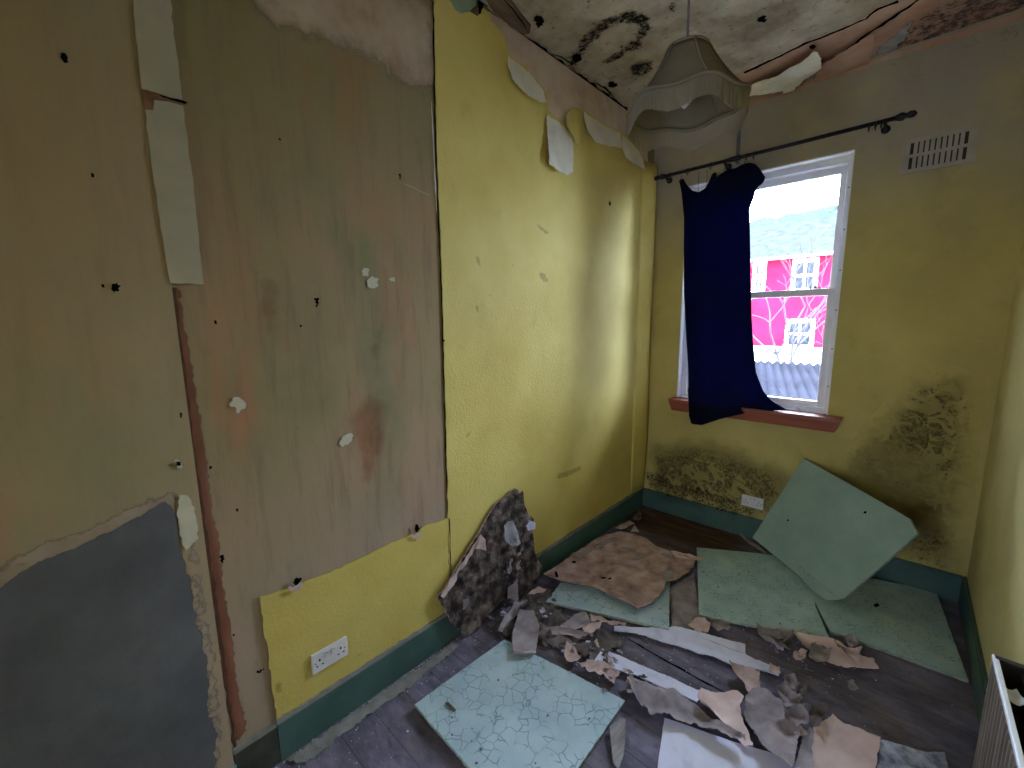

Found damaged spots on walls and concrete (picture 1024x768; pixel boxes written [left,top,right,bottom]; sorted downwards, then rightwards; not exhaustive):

peeling [253,0,435,87]
peeling [450,0,660,175]
mould [570,10,651,68]
mould [631,60,653,75]
peeling [749,11,1024,105]
peeling [361,267,395,289]
mould [647,453,772,515]